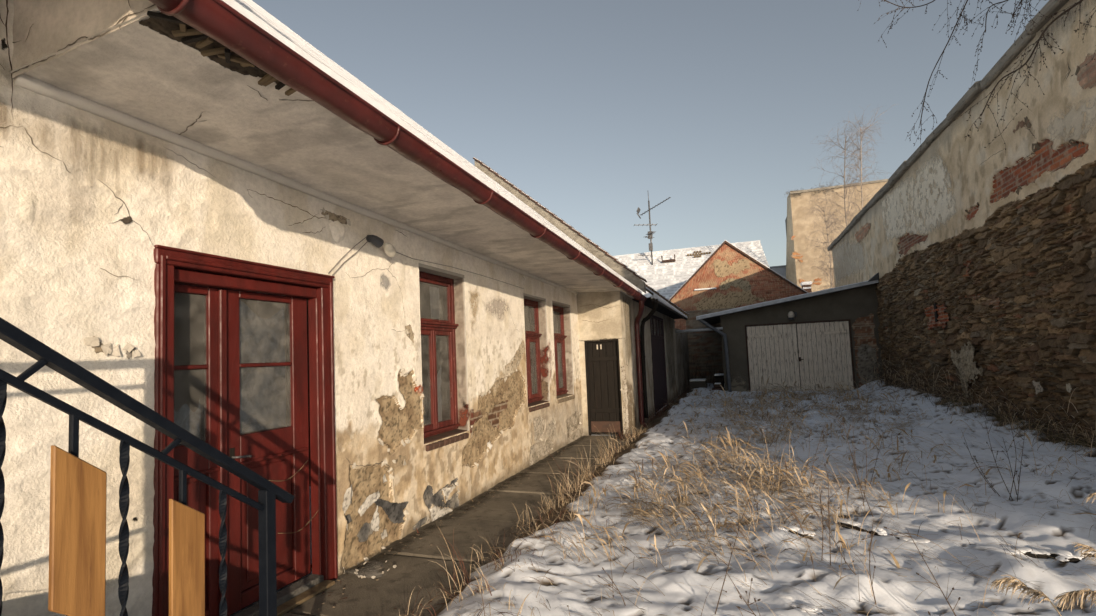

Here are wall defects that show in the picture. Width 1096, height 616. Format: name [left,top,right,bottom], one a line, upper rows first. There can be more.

crack [0,0,155,173]
flaking render [1075,53,1096,89]
crack [99,180,152,243]
spalling [897,232,929,257]
flaking render [965,139,1089,220]
spalling [341,340,526,573]